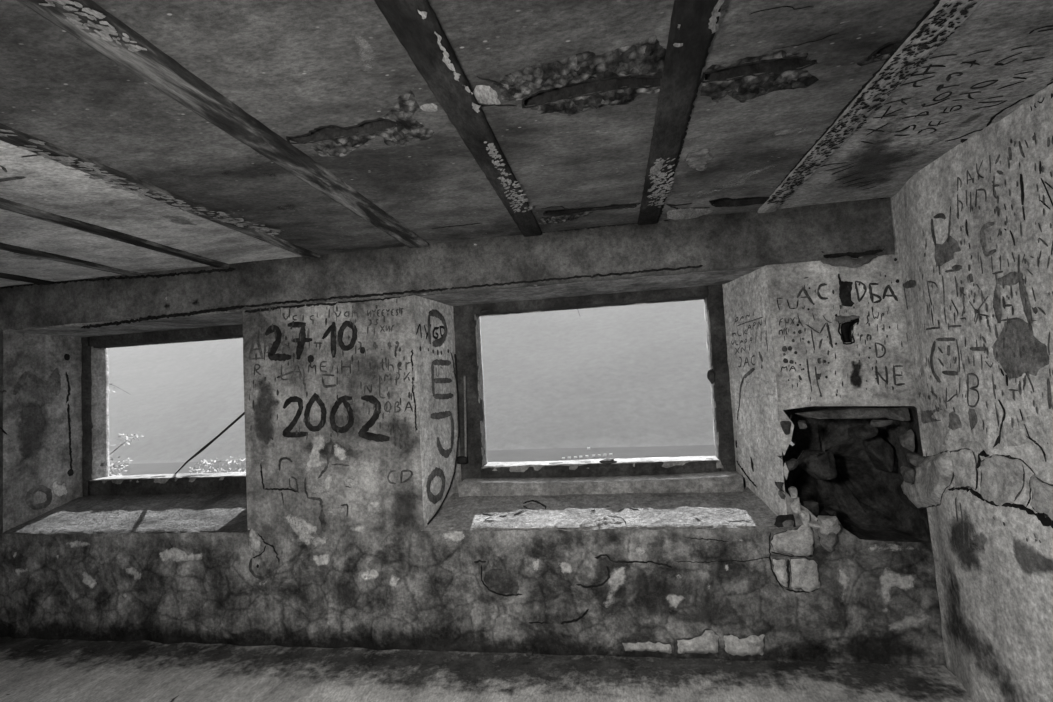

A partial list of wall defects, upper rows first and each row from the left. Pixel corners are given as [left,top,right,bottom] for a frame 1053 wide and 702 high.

peeling [39,0,147,52]
spalling [434,32,683,116]
peeling [708,0,724,33]
spalling [700,50,819,104]
spalling [857,40,904,66]
spalling [286,87,438,157]
spalling [484,141,770,224]
spalling [774,406,1053,551]
crack [948,436,1053,528]
peeling [839,569,848,598]
peeling [880,568,927,629]
spalling [1014,533,1053,574]